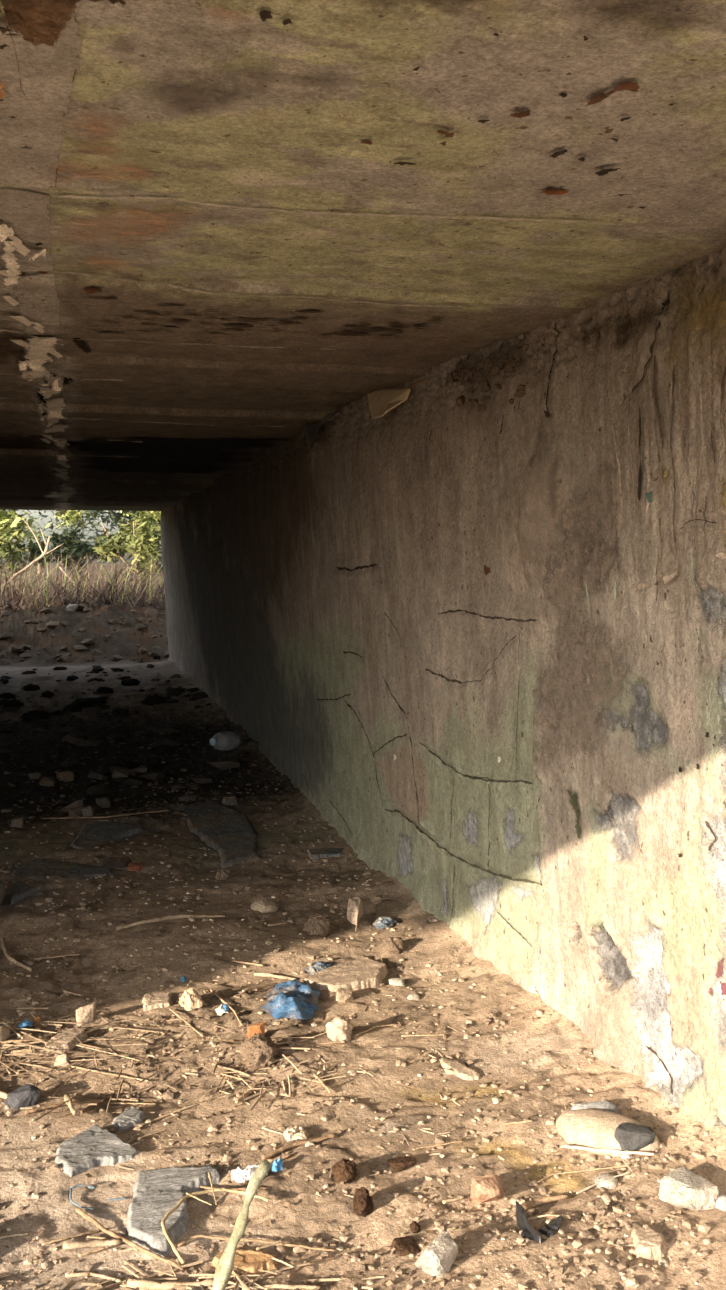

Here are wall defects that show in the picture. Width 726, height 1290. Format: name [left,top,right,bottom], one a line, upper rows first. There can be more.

rust [586,82,640,106]
crack [336,563,377,571]
spalling [596,680,668,750]
crack [317,609,544,947]
spalling [593,791,641,861]
spalling [701,814,726,946]
spalling [576,923,703,1108]
spalling [710,966,726,1049]